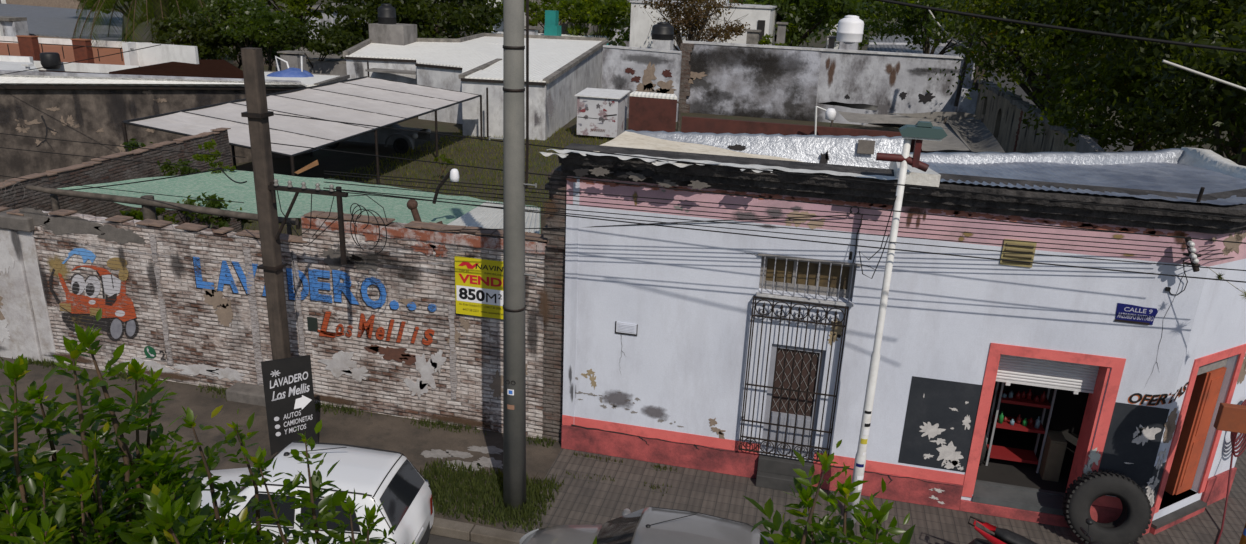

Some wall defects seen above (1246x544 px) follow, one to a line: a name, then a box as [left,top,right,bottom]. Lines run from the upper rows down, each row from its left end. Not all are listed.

water stain [689,51,802,73]
water stain [690,92,815,122]
peeling [575,369,640,413]
peeling [920,401,971,470]
peeling [1132,408,1177,507]